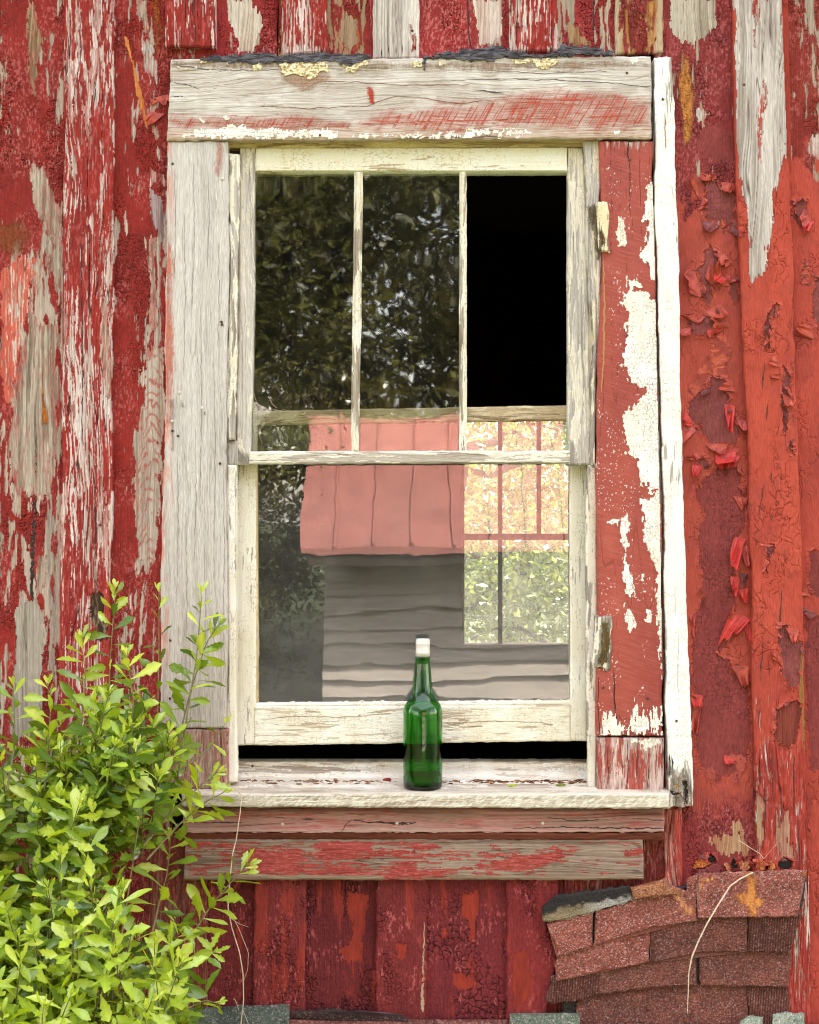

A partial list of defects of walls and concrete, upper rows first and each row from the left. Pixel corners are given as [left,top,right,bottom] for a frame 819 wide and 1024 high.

peeling [67,0,110,141]
peeling [137,0,169,140]
peeling [227,0,263,54]
peeling [473,0,503,46]
peeling [680,0,787,339]
peeling [0,160,79,563]
peeling [10,555,47,741]
peeling [131,347,166,576]
peeling [620,513,644,550]
peeling [681,375,796,873]
peeling [771,550,819,771]
crack [341,819,416,832]